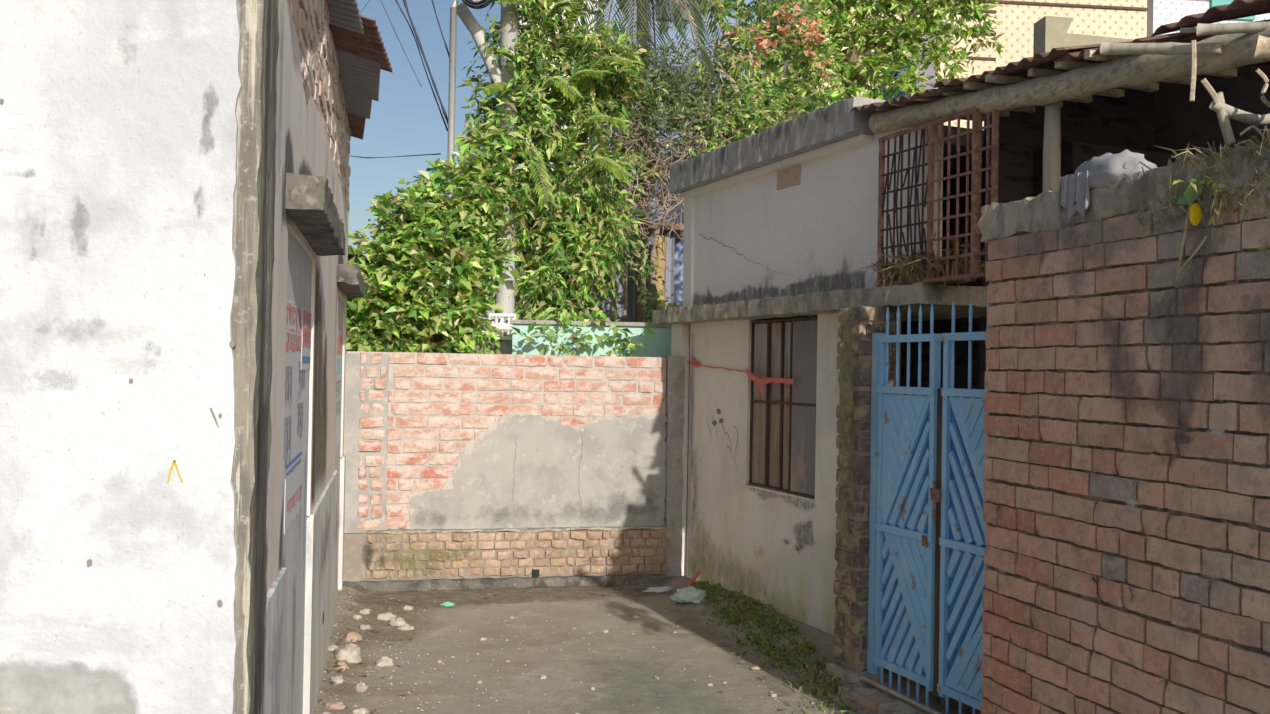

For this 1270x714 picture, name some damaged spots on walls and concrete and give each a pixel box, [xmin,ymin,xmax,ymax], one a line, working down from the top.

spalling [299,42,313,104]
water stain [304,265,327,571]
spalling [358,352,665,531]